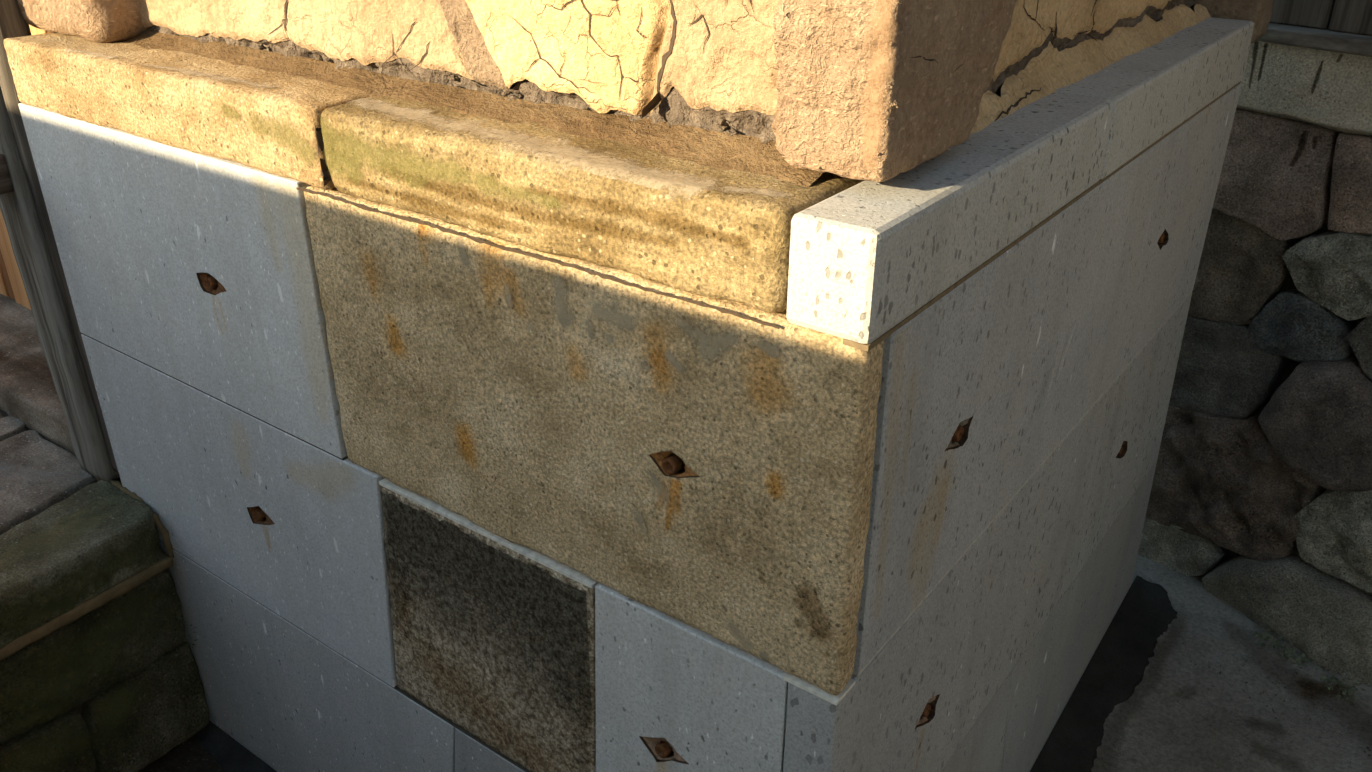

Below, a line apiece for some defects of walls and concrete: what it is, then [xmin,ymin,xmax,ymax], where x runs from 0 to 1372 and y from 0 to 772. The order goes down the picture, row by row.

crack [1023,0,1097,44]
crack [382,22,430,73]
crack [511,0,710,119]
damp [1249,42,1268,88]
damp [1312,54,1342,93]
crack [994,88,1041,122]
damp [1291,132,1317,166]